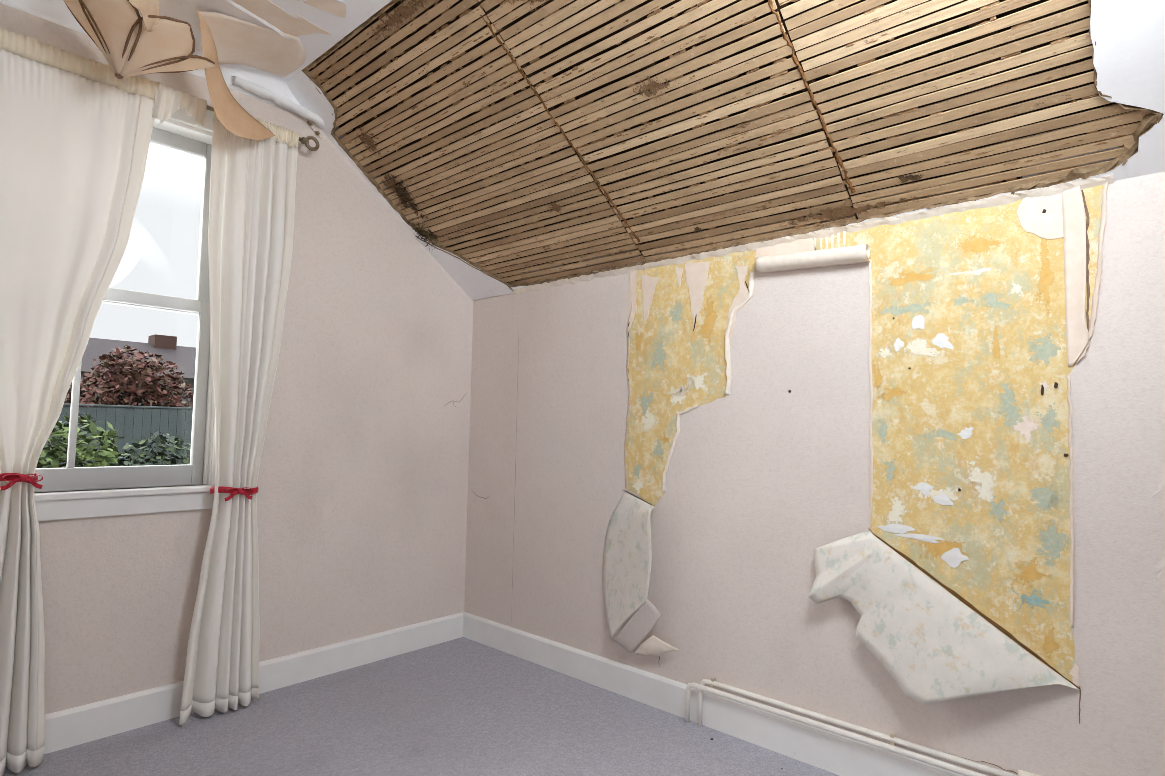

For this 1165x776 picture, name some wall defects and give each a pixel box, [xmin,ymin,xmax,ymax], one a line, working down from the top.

peeling [128,0,160,32]
flaking render [196,0,1163,724]